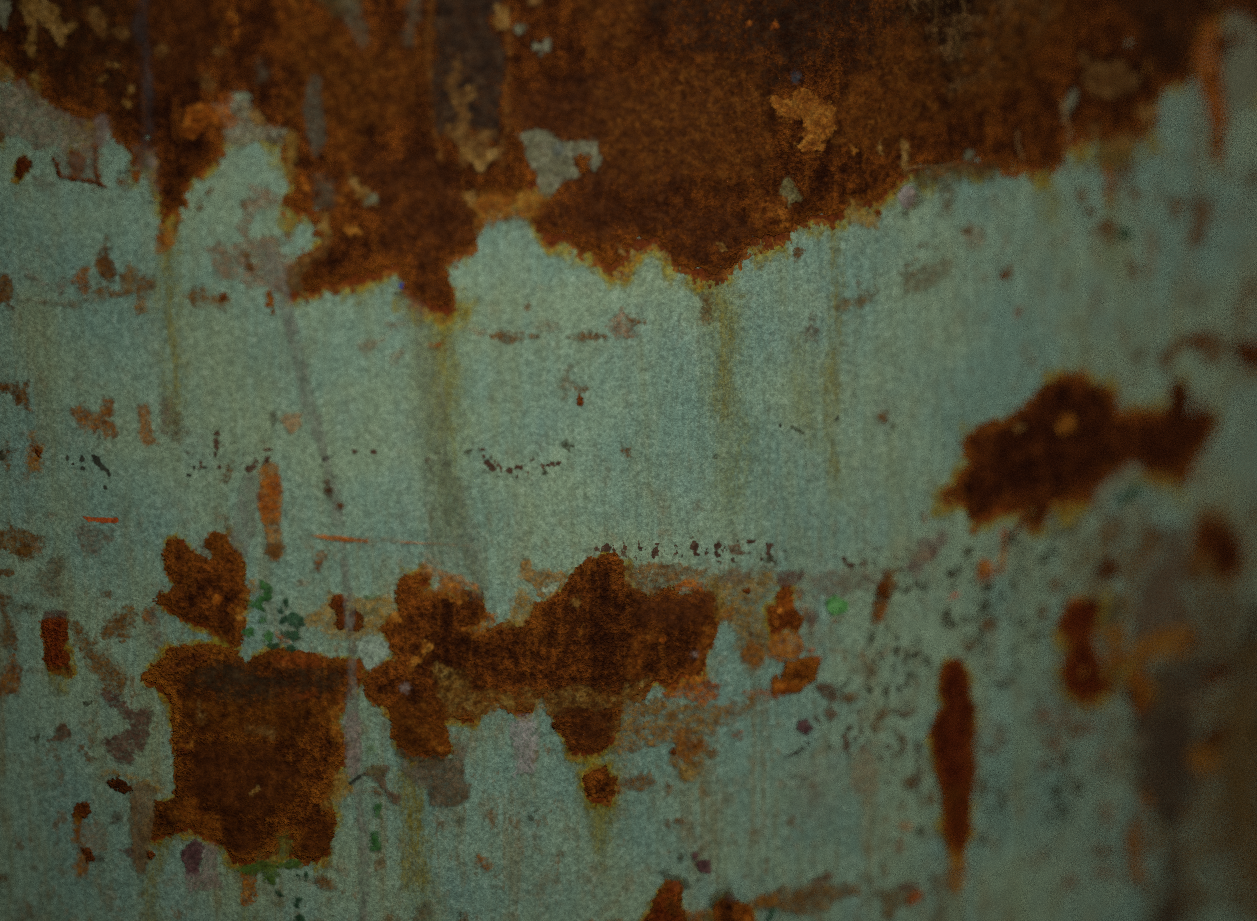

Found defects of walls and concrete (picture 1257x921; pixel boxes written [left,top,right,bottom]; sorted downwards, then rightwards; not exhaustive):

rust [0,0,1257,446]
rust [0,594,23,695]
rust [0,525,61,594]
rust [29,529,898,889]
rust [897,657,980,892]
rust [921,330,1257,592]
rust [1053,590,1158,718]
rust [640,871,862,921]